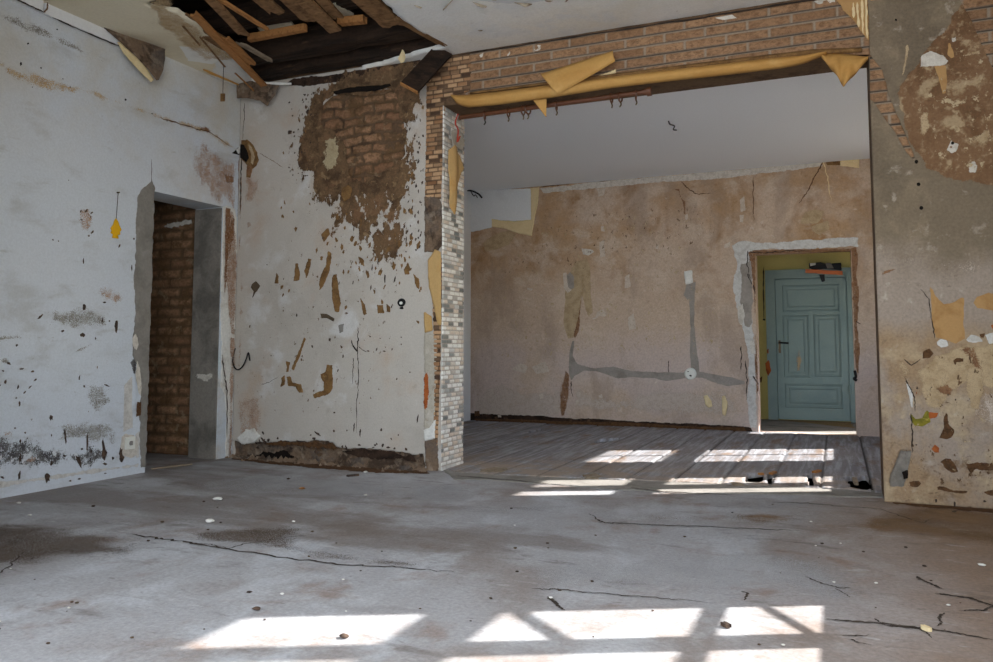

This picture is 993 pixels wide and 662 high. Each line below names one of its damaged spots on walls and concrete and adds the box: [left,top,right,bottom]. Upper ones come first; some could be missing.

peeling [179,46,223,64]
peeling [898,4,993,186]
spalling [251,60,424,358]
spalling [220,206,425,468]
spalling [740,335,771,400]
spalling [746,247,860,373]
water stain [0,422,118,469]
peeling [889,333,993,506]
water stain [0,522,140,570]
water stain [173,527,414,568]
crack [134,534,453,572]
crack [805,576,993,645]